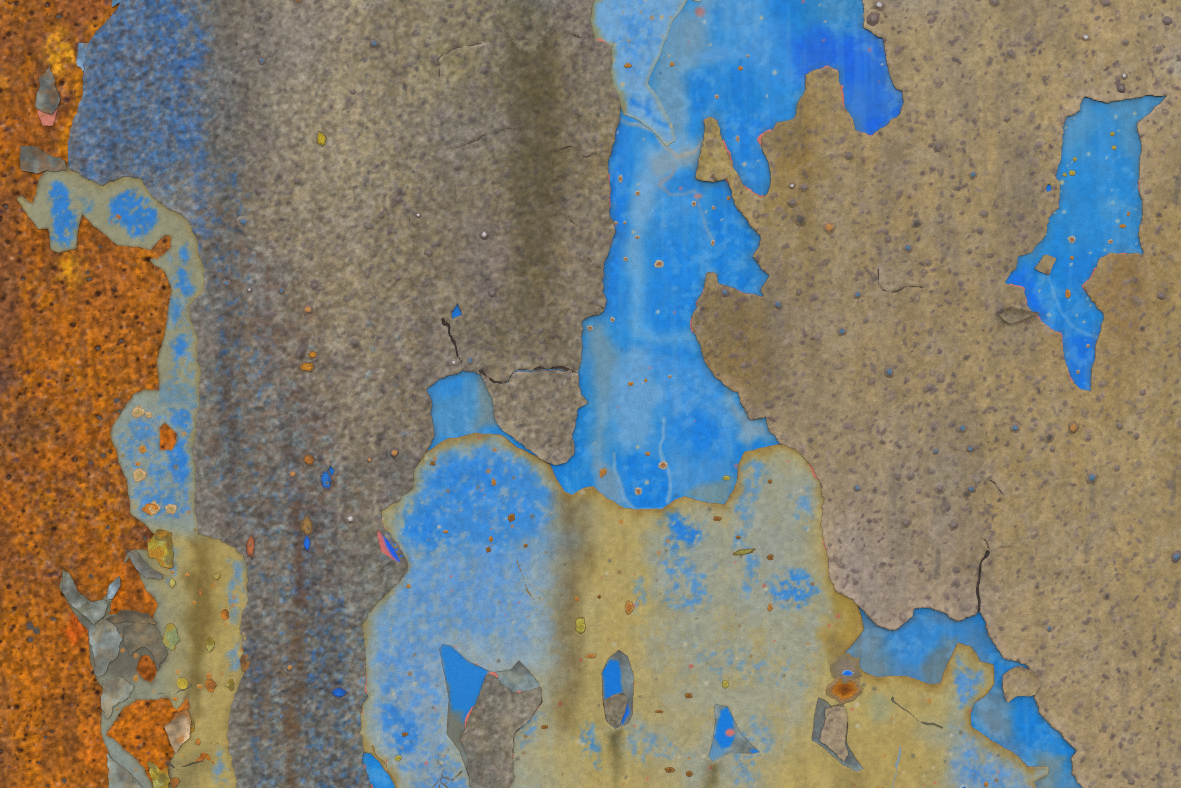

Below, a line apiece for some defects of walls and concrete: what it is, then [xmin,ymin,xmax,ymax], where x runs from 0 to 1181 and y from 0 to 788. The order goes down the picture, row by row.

rust [0,0,190,788]
peeling [17,164,256,788]
peeling [316,131,327,147]
peeling [330,686,347,698]
crack [441,318,575,384]
peeling [360,0,1082,788]
crack [976,540,992,611]
peeling [997,96,1166,391]